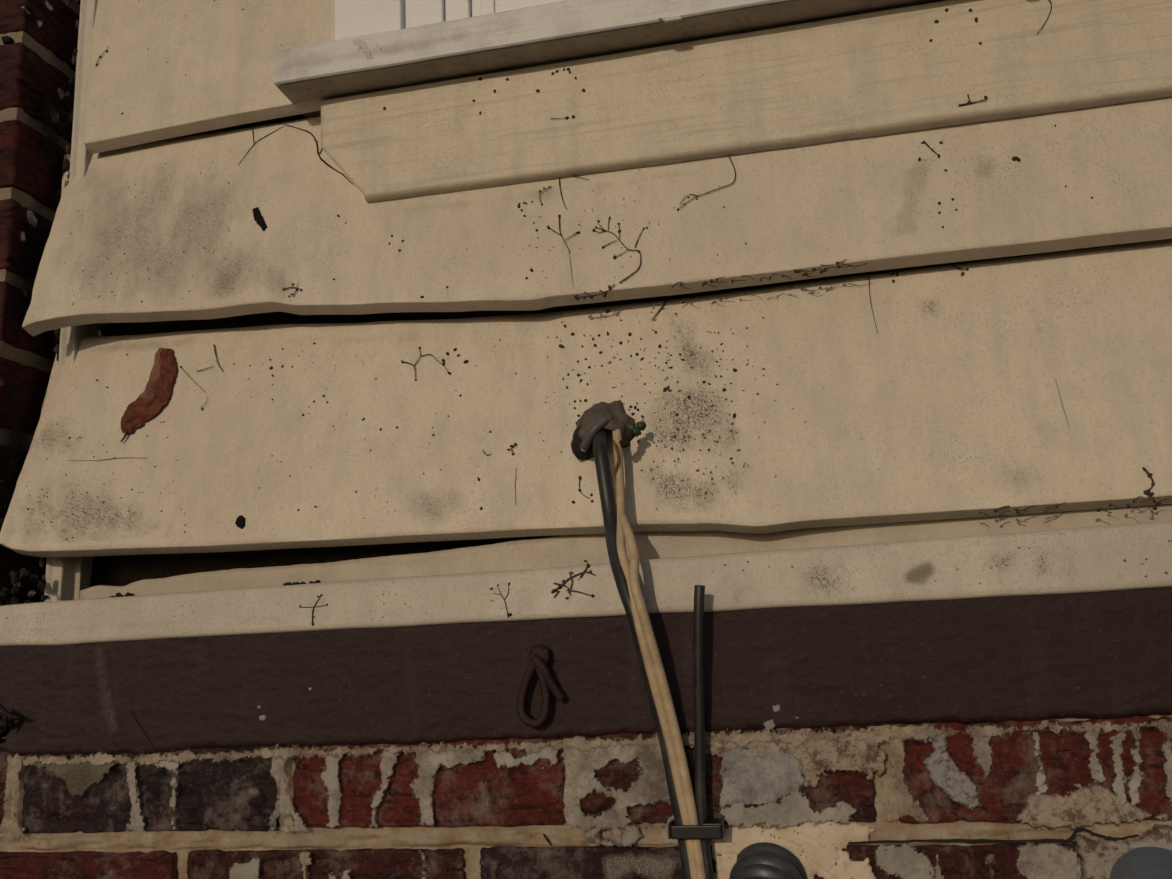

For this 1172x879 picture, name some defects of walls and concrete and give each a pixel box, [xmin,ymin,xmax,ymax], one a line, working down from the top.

damp [655,391,735,447]
damp [22,732,660,767]
damp [681,723,944,747]
damp [972,720,1172,806]
damp [720,791,856,828]
damp [604,855,674,879]
damp [931,853,945,879]